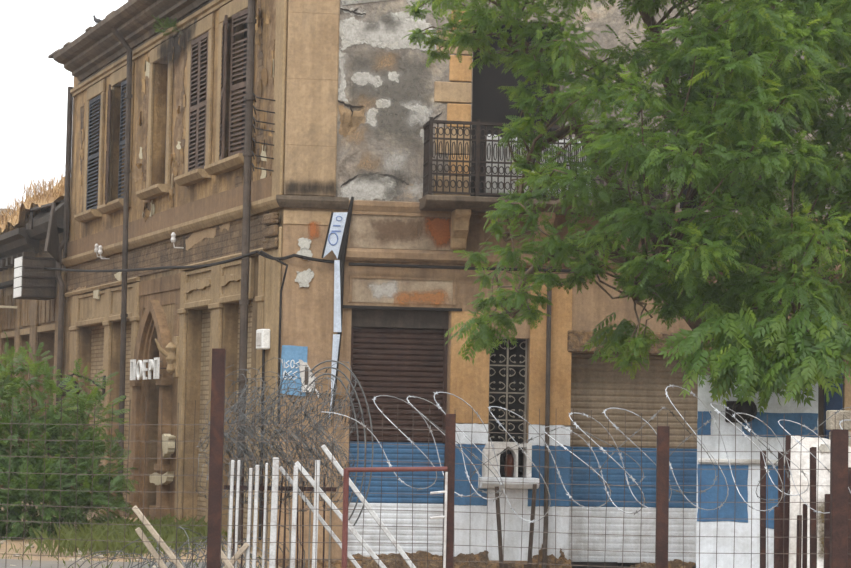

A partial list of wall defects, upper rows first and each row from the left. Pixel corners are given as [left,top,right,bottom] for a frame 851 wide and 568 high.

peeling [338,0,436,137]
peeling [168,28,187,207]
crack [341,172,409,187]
peeling [341,171,423,201]
peeling [295,238,314,287]